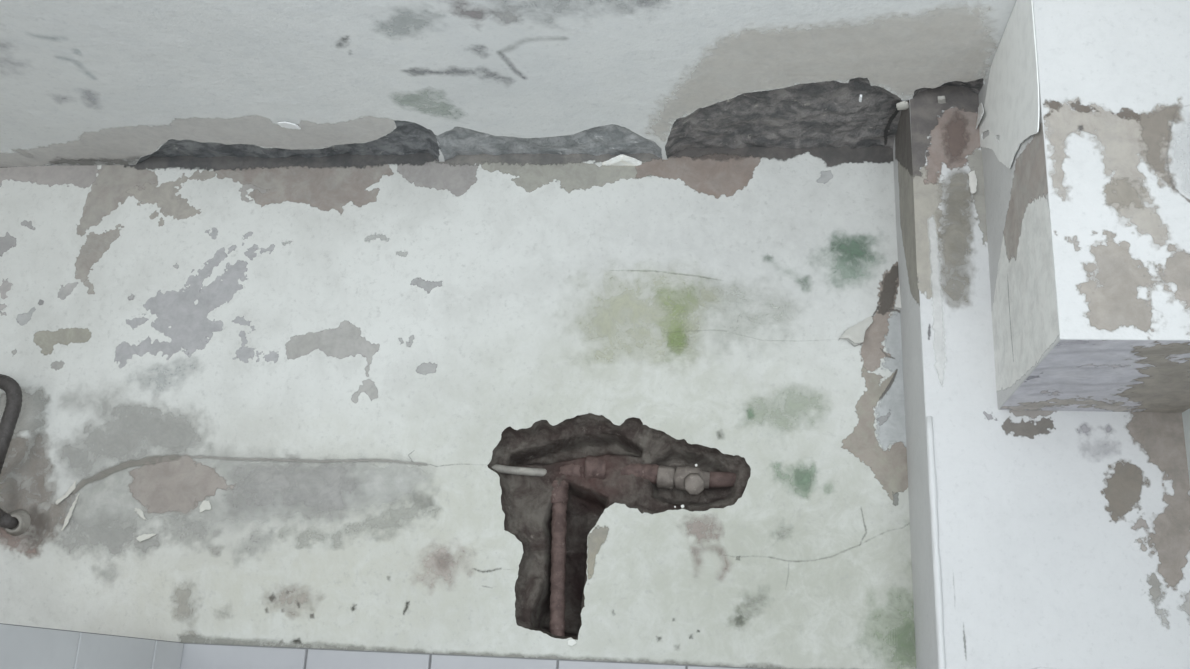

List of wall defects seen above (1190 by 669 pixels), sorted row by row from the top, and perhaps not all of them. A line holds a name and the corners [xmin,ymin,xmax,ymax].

spalling [0,0,1182,506]
peeling [199,500,212,512]
spalling [487,413,751,646]